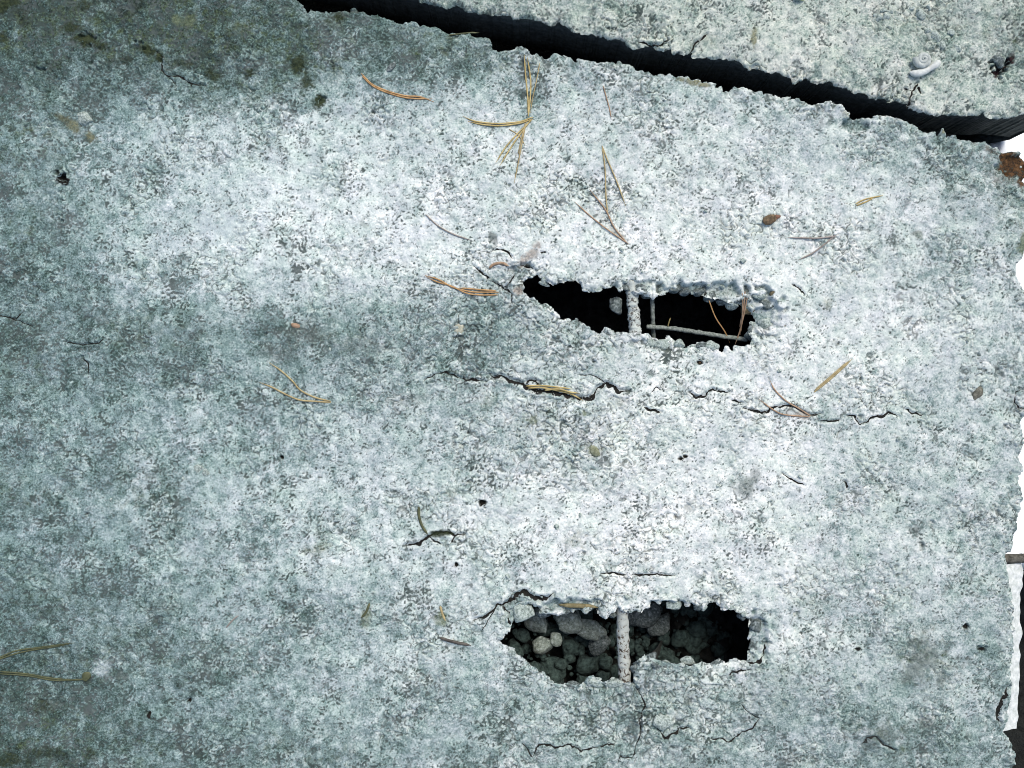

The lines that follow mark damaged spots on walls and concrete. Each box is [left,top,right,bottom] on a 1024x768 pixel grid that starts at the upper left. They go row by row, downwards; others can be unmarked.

crack [904,83,921,108]
spalling [523,275,785,365]
crack [426,371,661,413]
crack [690,389,923,425]
crack [407,531,465,546]
spalling [499,600,761,692]
crack [522,687,760,762]
spalling [652,714,674,731]